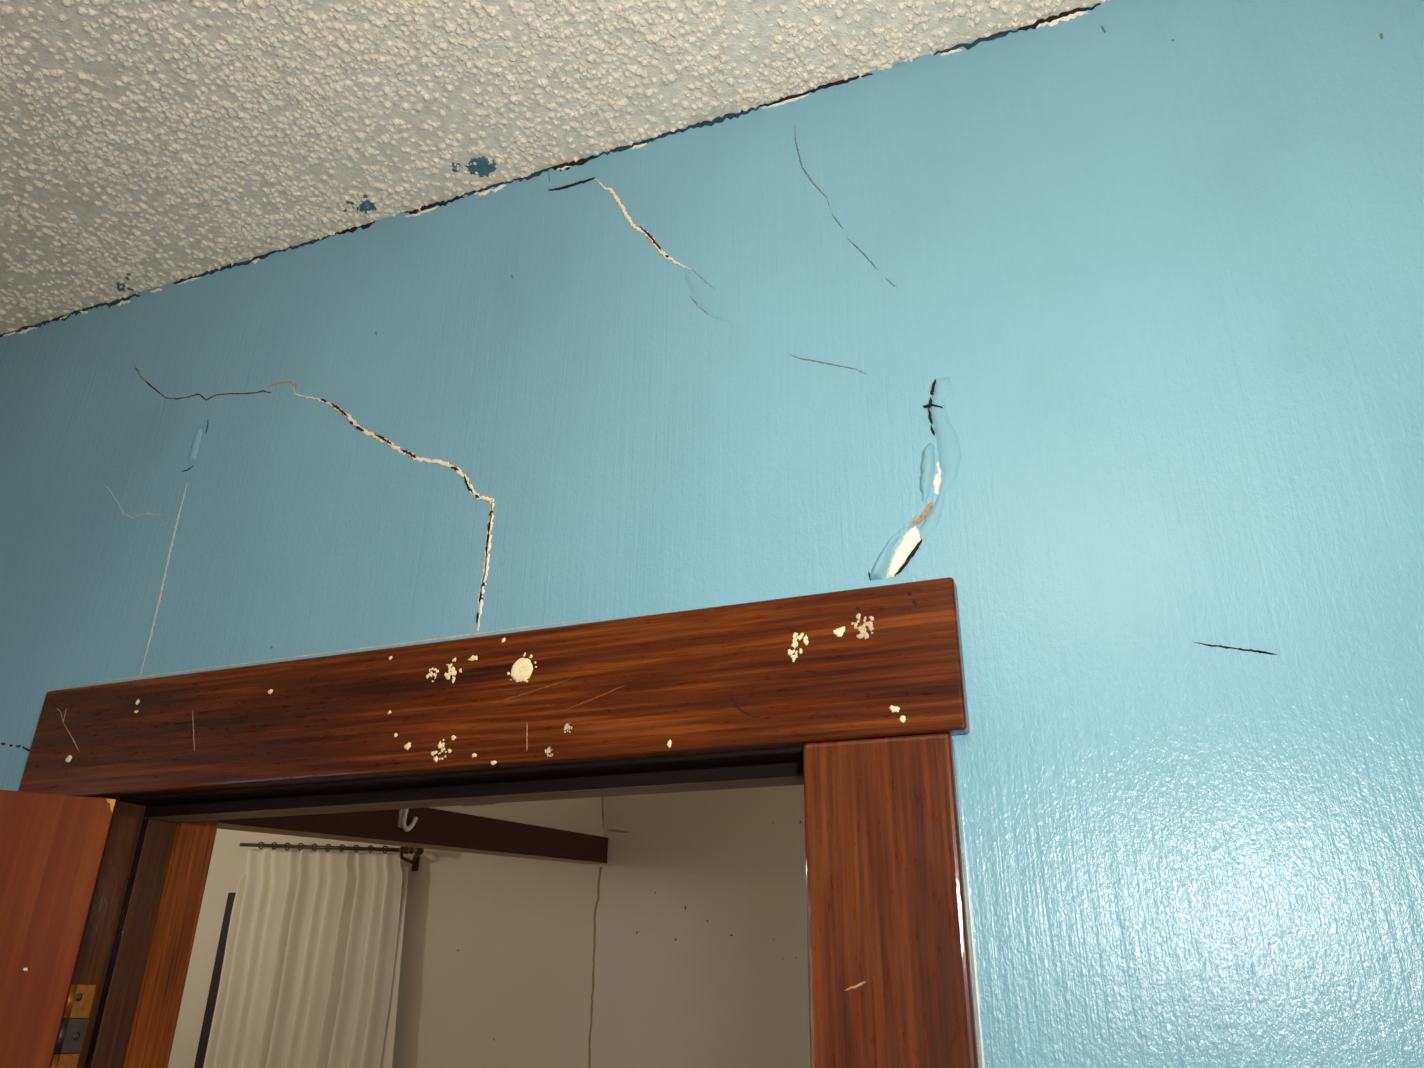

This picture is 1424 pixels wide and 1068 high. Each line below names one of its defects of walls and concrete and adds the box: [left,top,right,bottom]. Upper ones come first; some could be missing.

crack [934,3,1101,56]
crack [0,73,897,337]
crack [102,465,194,675]
crack [134,366,495,632]
peeling [868,376,961,580]